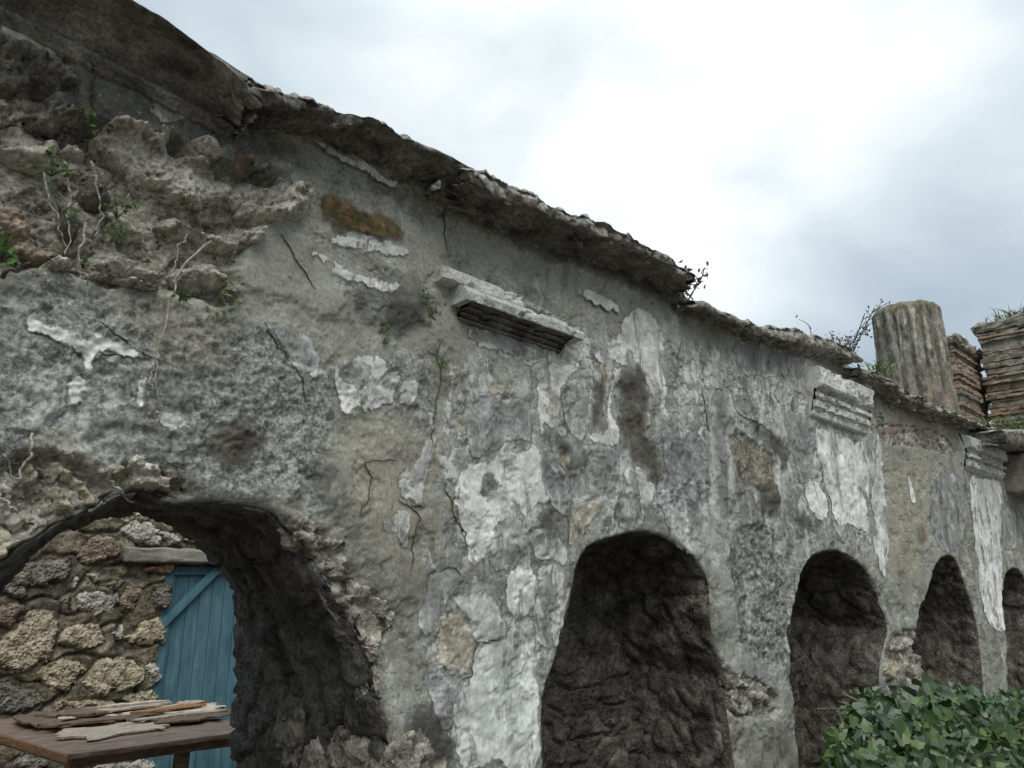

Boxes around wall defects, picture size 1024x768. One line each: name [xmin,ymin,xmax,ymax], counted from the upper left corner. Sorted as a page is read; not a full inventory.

spalling [0,26,314,308]
crack [281,233,316,290]
peeling [312,229,409,292]
peeling [26,311,141,405]
crack [264,322,306,399]
crack [360,459,399,516]
peeling [272,289,778,768]
water stain [593,360,662,508]
water stain [668,505,684,549]
water stain [706,395,737,556]
water stain [755,407,789,515]
peeling [733,340,1016,631]